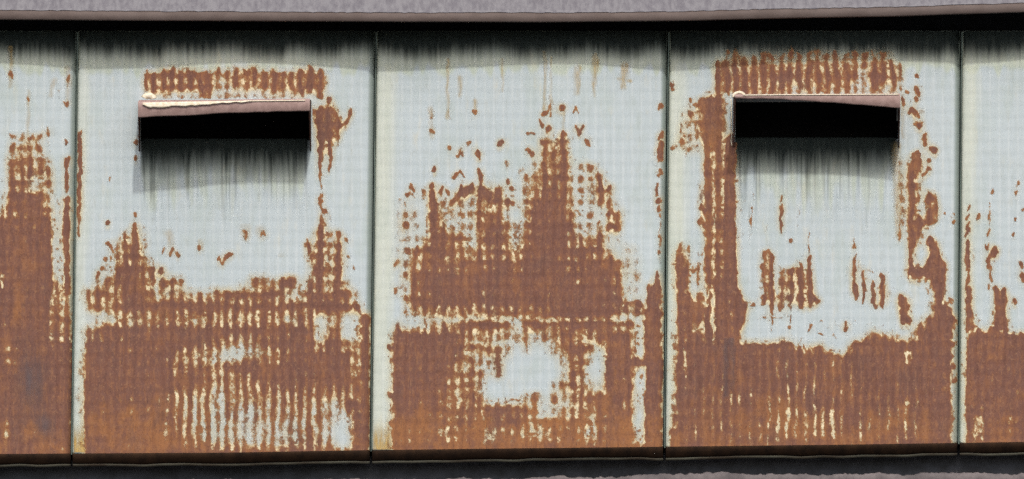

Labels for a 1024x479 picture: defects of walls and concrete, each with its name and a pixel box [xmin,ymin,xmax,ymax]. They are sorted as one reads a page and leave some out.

rust [0,65,371,454]
rust [387,48,1024,450]